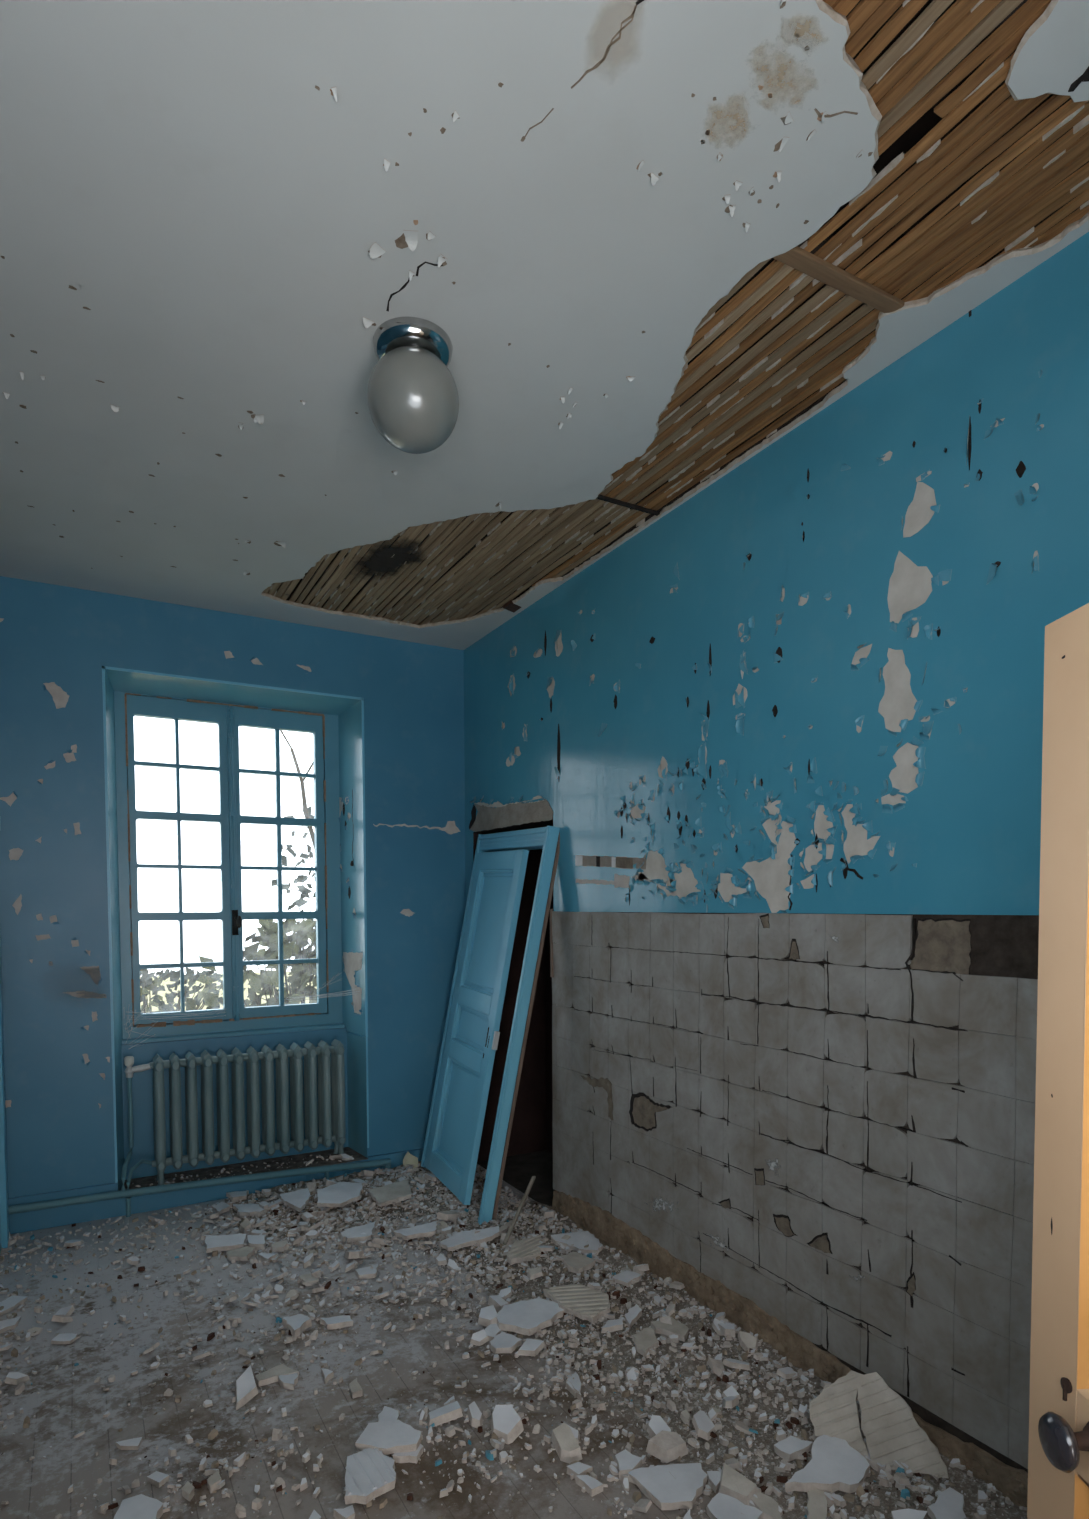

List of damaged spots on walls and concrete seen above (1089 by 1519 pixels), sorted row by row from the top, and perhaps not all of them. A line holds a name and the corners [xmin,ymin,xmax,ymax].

crack [523,0,644,141]
peeling [368,220,448,267]
peeling [964,399,1005,488]
peeling [1014,461,1039,505]
water stain [358,542,421,577]
peeling [42,682,69,709]
peeling [506,630,595,782]
peeling [614,469,968,928]
flaking render [469,795,553,832]
spalling [906,917,972,975]
peeling [342,949,363,1016]
spalling [580,1075,671,1132]